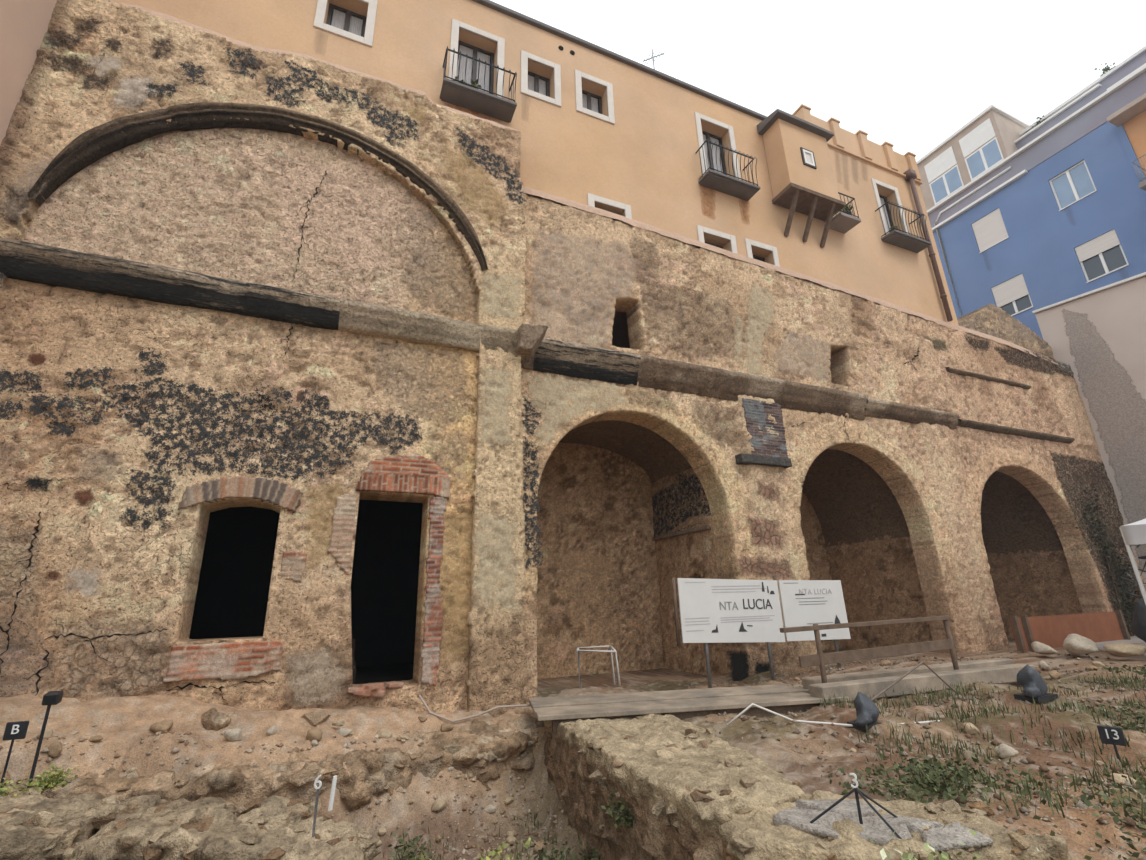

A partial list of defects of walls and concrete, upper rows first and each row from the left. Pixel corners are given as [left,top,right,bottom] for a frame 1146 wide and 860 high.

crack [294,171,332,279]
crack [3,477,88,493]
peeling [1050,309,1146,618]
crack [0,512,167,696]